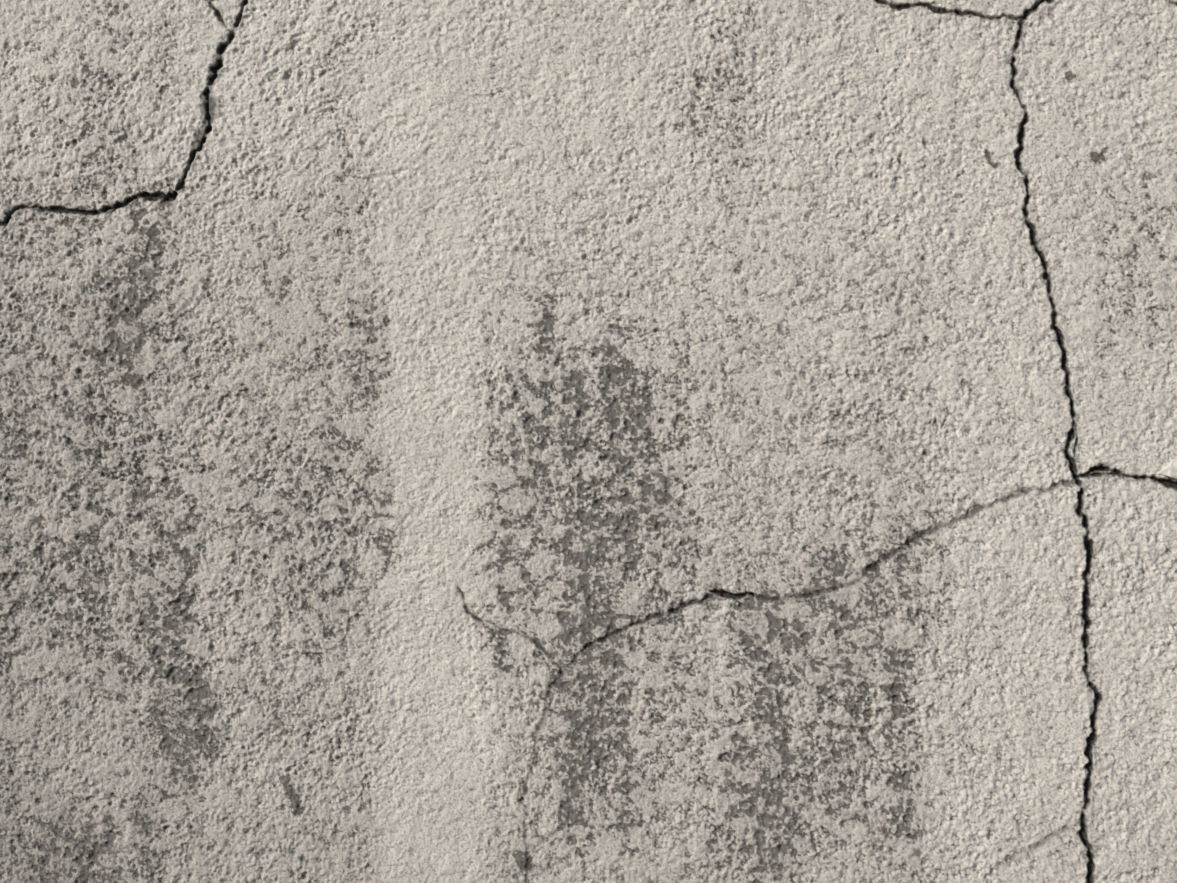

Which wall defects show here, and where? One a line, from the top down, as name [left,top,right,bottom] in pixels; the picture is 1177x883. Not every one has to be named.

crack [0,0,248,226]
leakage [94,2,180,111]
leakage [258,248,292,305]
leakage [346,297,391,410]
leakage [0,408,28,485]
leakage [12,37,225,883]
crack [520,0,1177,883]
leakage [0,579,20,674]
leakage [239,415,401,663]
crack [460,590,482,622]
leakage [473,290,951,883]
leakage [279,776,302,816]